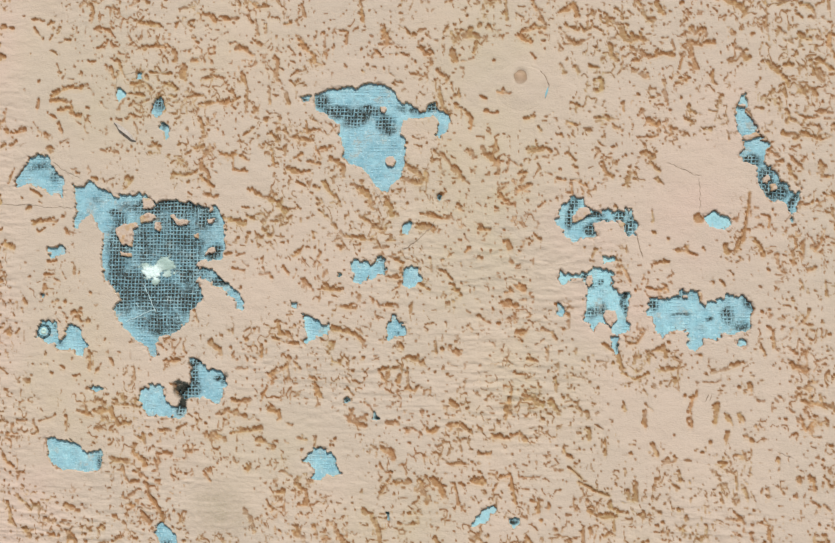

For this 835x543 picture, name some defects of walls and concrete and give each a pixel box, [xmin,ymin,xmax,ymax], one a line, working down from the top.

peeling [301,83,450,193]
peeling [734,93,800,223]
peeling [554,196,638,242]
peeling [704,211,731,230]
peeling [16,153,244,357]
peeling [351,256,387,284]
peeling [291,303,330,344]
peeling [558,256,631,355]
peeling [643,289,753,352]
peeling [139,358,228,419]
peeling [47,437,103,472]
peeling [302,447,342,480]